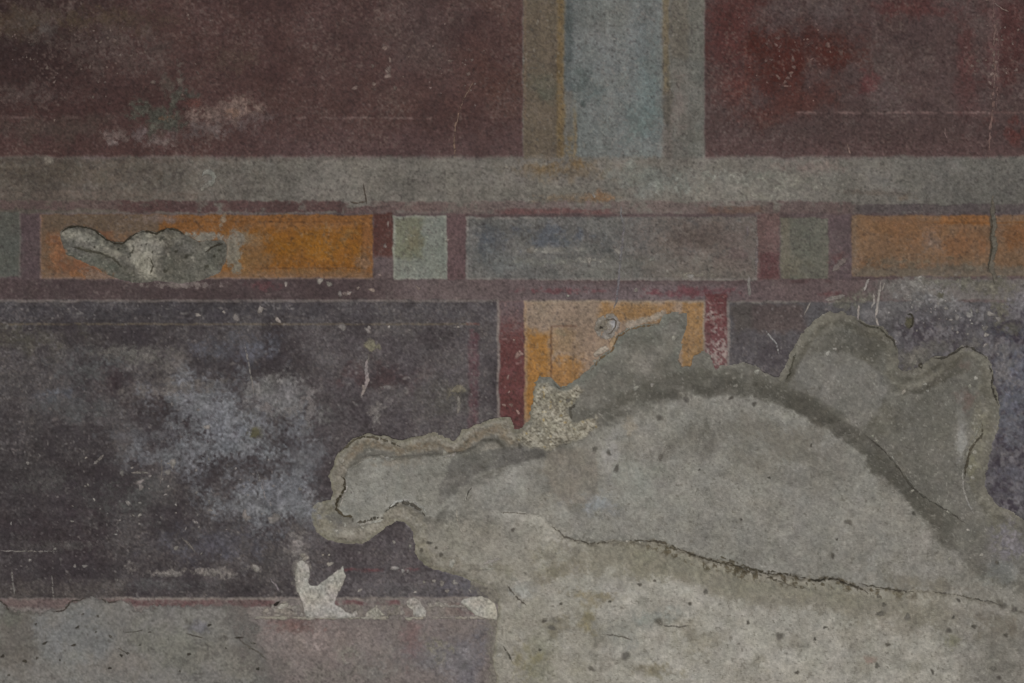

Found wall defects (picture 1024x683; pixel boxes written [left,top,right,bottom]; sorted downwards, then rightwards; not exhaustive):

flaking render [60,225,227,284]
crack [988,196,998,284]
peeling [114,460,177,535]
flaking render [311,284,1024,683]